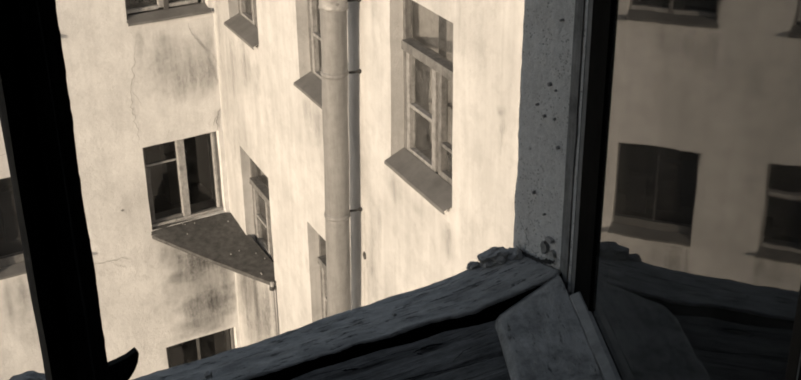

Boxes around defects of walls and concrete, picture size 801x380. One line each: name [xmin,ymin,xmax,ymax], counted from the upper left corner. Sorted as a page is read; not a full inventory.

crack [188,23,219,83]